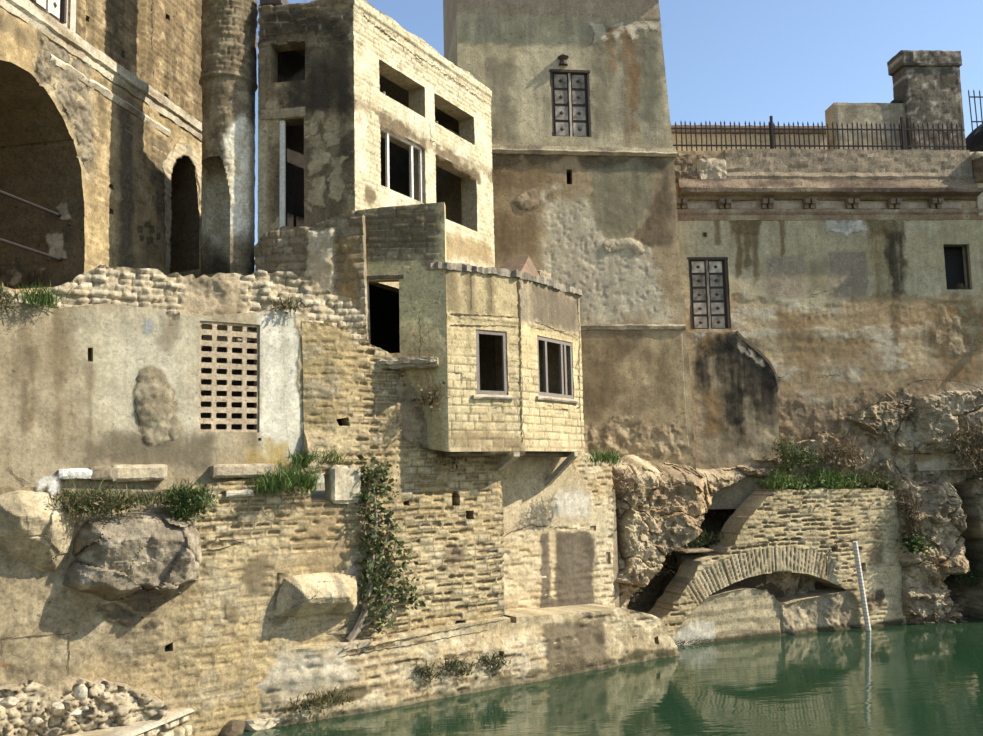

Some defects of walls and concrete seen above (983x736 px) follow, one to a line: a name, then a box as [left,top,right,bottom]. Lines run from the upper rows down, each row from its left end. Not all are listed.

water stain [714,220,761,281]
water stain [868,219,906,344]
spalling [134,366,182,446]
water stain [696,333,780,450]
water stain [555,491,590,517]
water stain [540,531,598,608]
water stain [544,618,606,673]